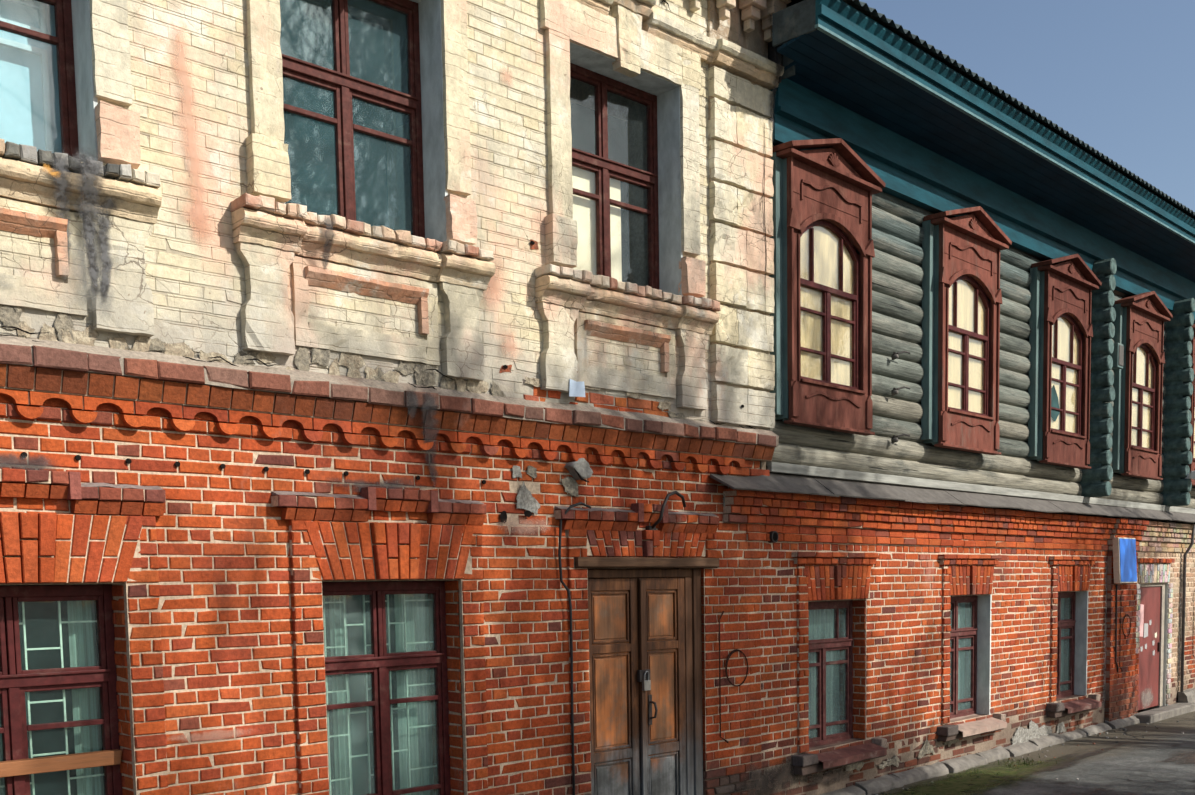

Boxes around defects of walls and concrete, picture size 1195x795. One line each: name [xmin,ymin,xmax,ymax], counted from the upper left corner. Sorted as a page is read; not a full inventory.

damp [44,153,117,298]
flaking render [0,304,513,397]
spalling [523,376,755,429]